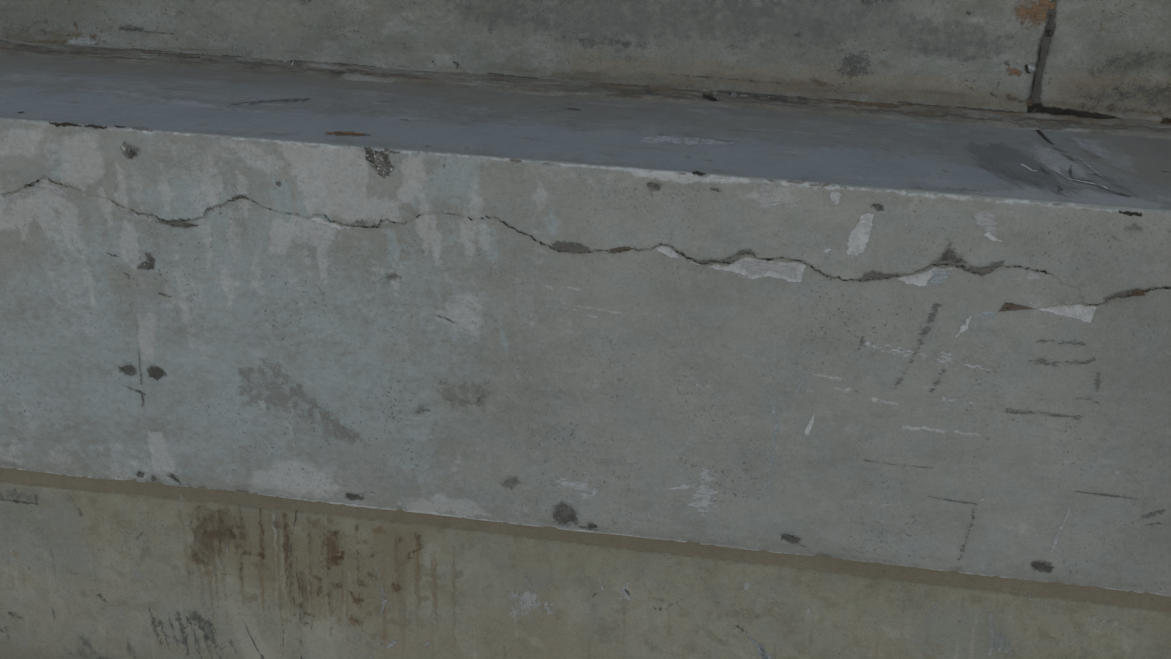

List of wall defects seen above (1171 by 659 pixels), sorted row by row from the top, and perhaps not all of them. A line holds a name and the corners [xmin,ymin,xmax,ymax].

crack [899,0,1131,197]
spalling [49,122,153,132]
spalling [364,147,400,178]
crack [109,195,297,228]
crack [325,198,1050,281]
peeling [846,204,884,263]
crack [999,303,1035,312]
peeling [1024,271,1097,323]
crack [1068,286,1171,305]